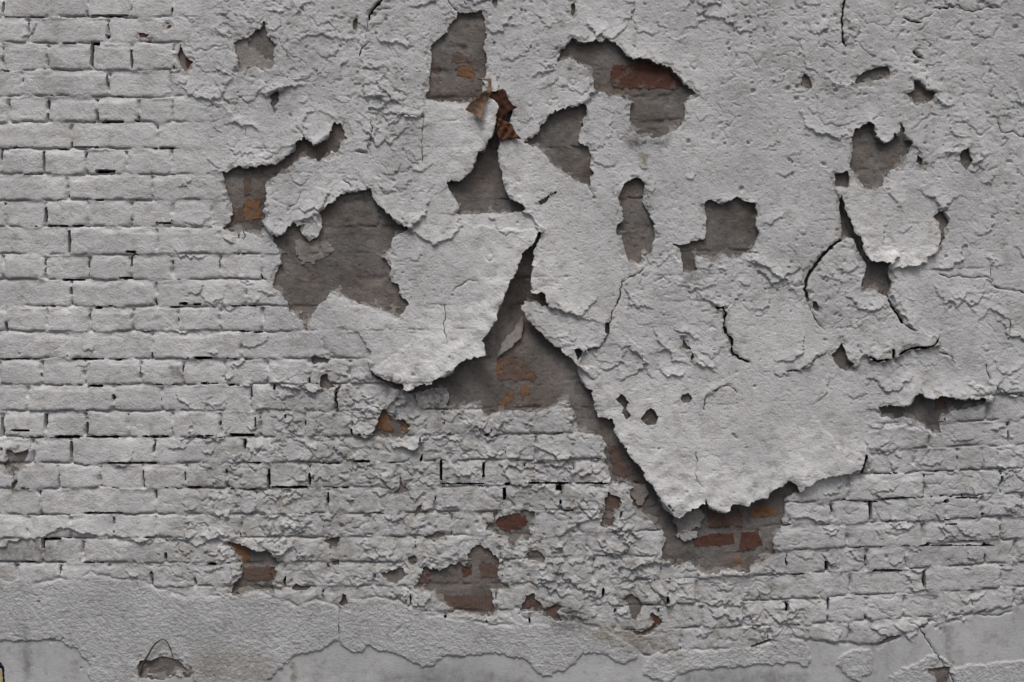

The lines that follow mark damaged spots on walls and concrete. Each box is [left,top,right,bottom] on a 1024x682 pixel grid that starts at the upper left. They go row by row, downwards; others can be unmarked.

crack [838,0,846,46]
peeling [223,11,999,575]
crack [715,303,748,362]
crack [796,239,842,326]
crack [869,292,956,364]
peeling [228,541,279,596]
peeling [375,509,545,622]
peeling [137,656,192,680]